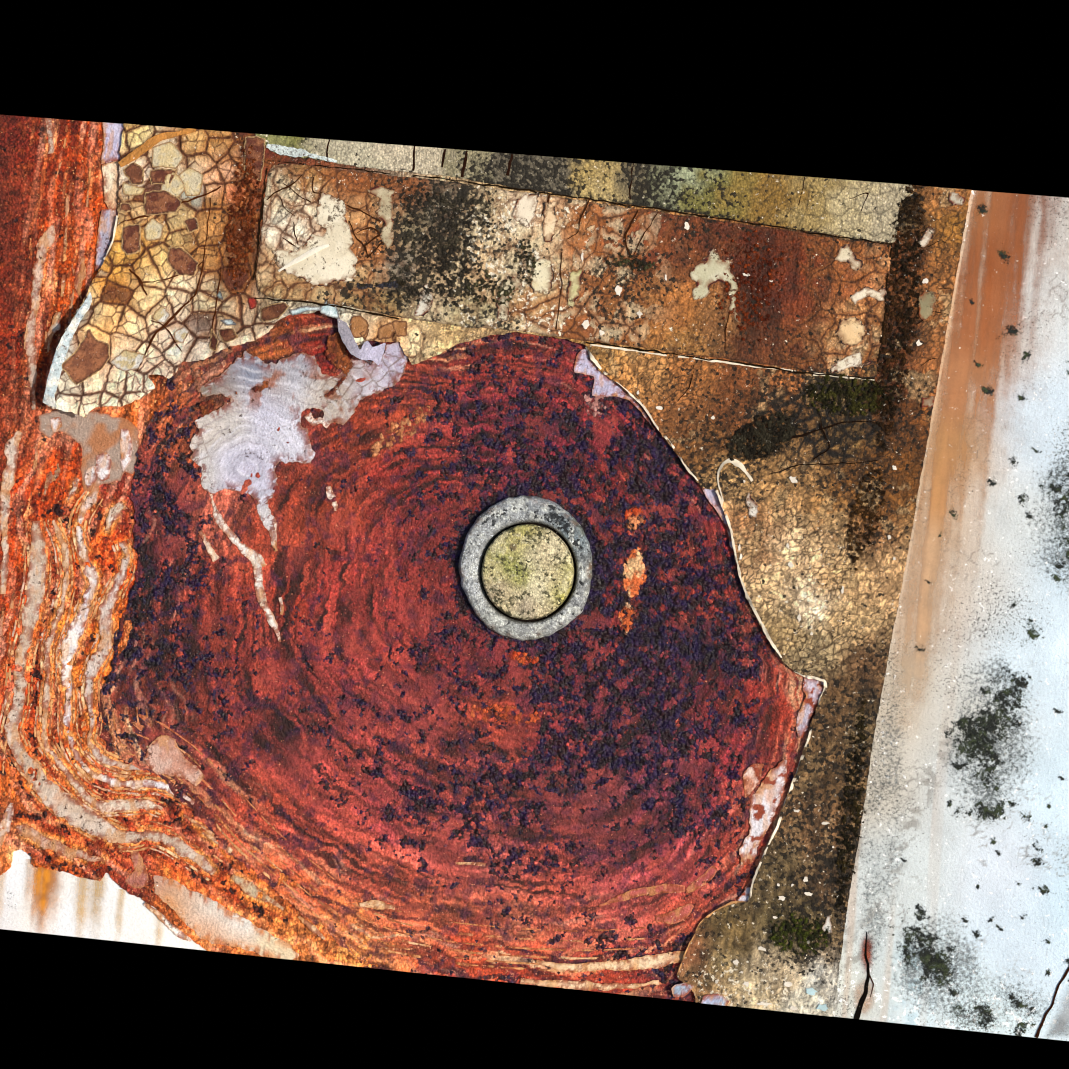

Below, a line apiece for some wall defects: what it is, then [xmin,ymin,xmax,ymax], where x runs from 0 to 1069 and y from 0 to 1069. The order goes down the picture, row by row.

damp [357,188,541,309]
corrosion [0,115,818,1002]
peeling [0,118,972,1017]
damp [722,410,800,462]
corrosion [902,190,1046,693]
damp [1018,456,1069,581]
damp [945,658,1047,828]
damp [765,696,1040,1036]
crack [853,932,874,1019]
crack [1035,967,1069,1038]